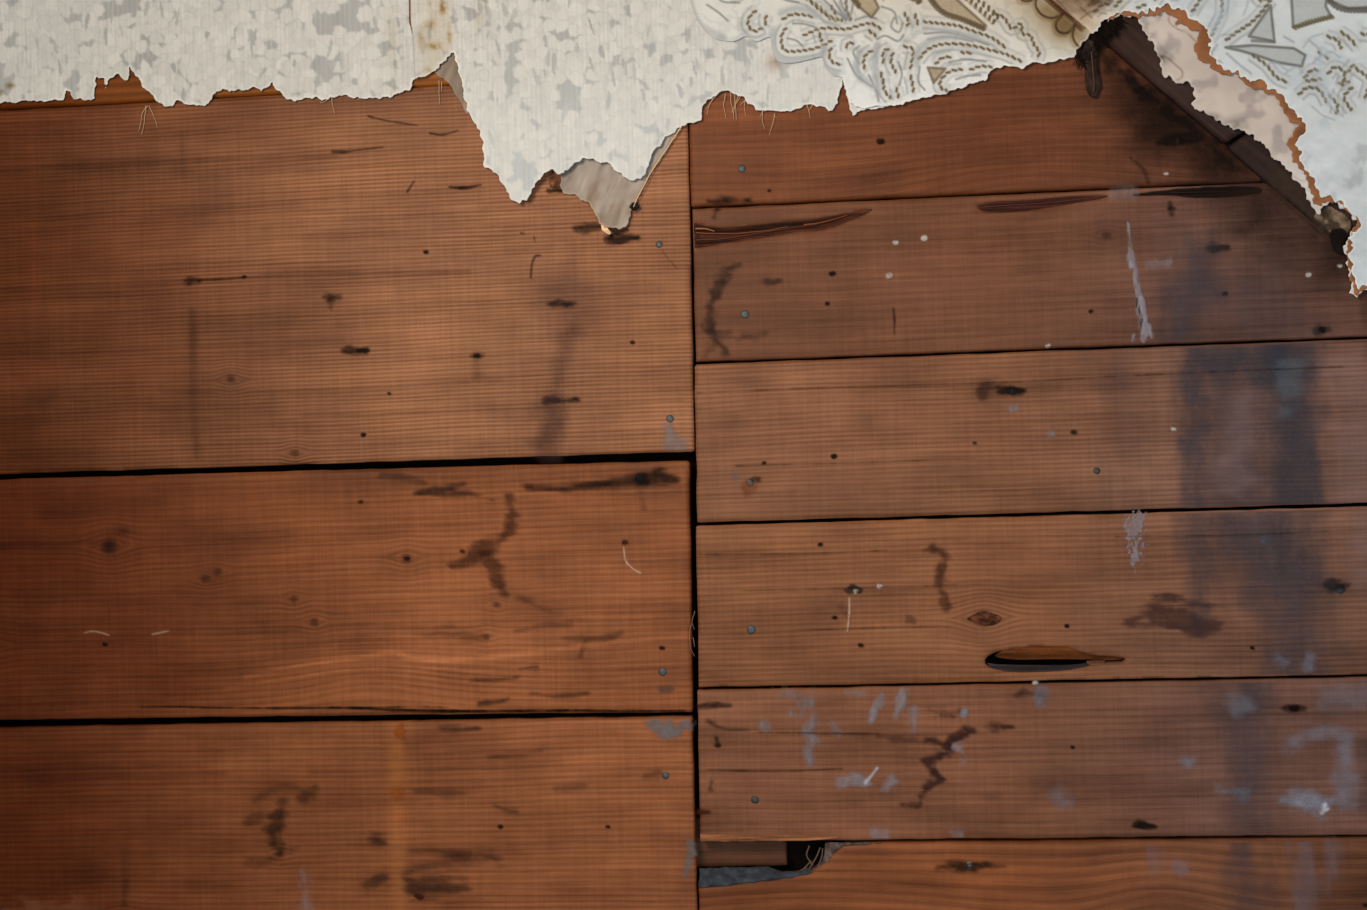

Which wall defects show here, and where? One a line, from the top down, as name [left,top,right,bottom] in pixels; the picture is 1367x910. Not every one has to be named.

spalling [978,195,1108,212]
spalling [1132,186,1262,198]
spalling [694,209,872,248]
spalling [1314,206,1351,254]
damp [1324,579,1349,591]
damp [1126,594,1220,636]